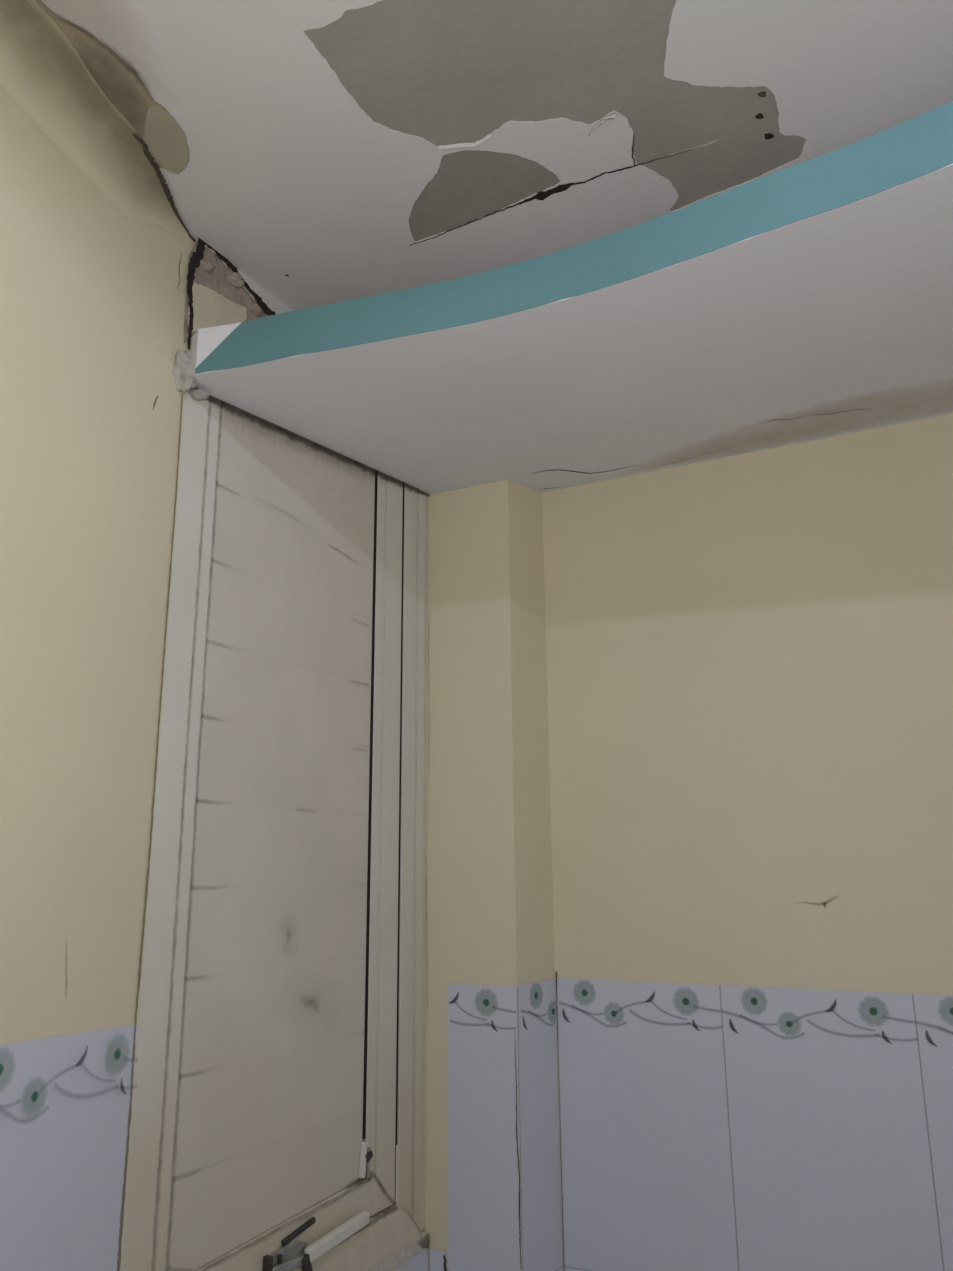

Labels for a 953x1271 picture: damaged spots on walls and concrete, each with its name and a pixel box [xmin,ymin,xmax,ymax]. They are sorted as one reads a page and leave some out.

crack [133,133,196,289]
crack [409,135,693,246]
peeling [304,0,806,242]
crack [533,465,636,474]